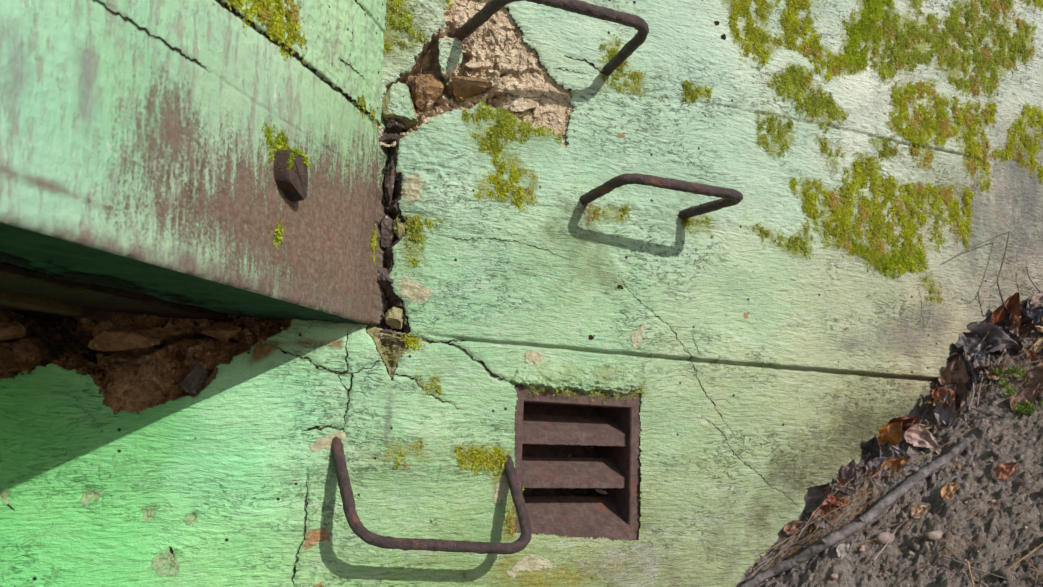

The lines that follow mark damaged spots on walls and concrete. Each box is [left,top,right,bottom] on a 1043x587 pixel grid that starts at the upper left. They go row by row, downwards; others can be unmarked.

corrosion [60,67,390,326]
spalling [366,0,574,381]
spalling [0,310,292,415]
crack [275,332,458,433]
crack [393,333,510,382]
crack [619,277,798,507]
crack [291,479,308,585]